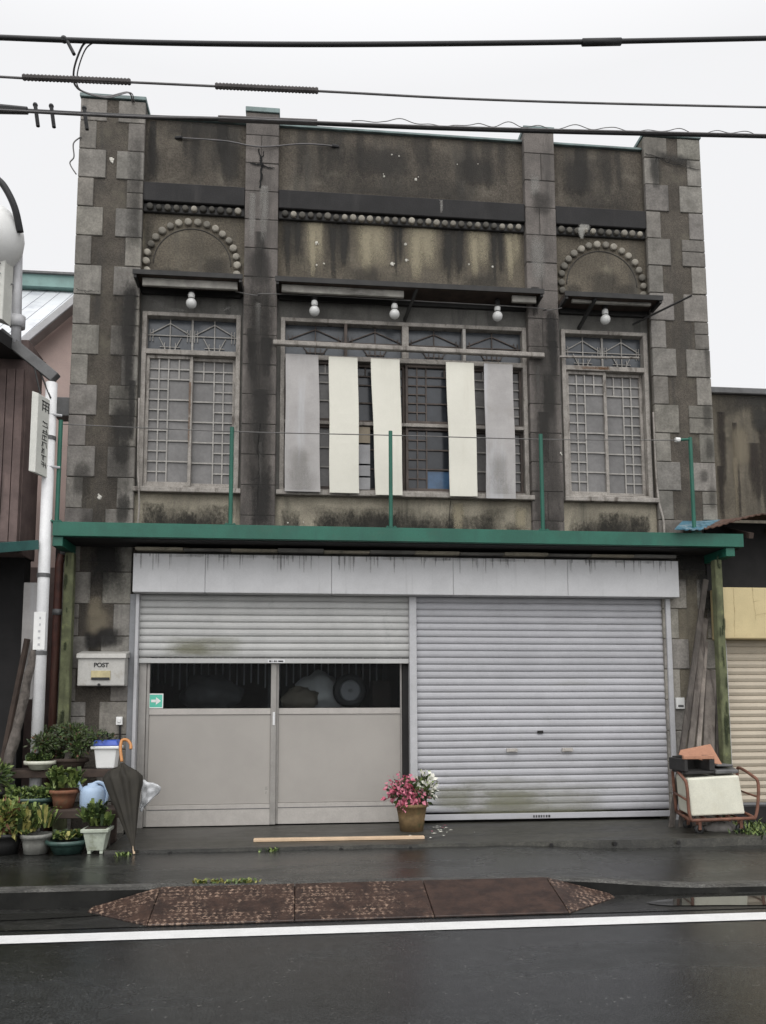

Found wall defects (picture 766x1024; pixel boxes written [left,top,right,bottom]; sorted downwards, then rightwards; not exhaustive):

water stain [329,223,372,276]
water stain [392,227,422,276]
water stain [443,229,513,279]
water stain [248,231,272,525]
water stain [718,410,766,516]
water stain [144,509,227,524]
water stain [318,503,492,529]
water stain [585,517,648,532]